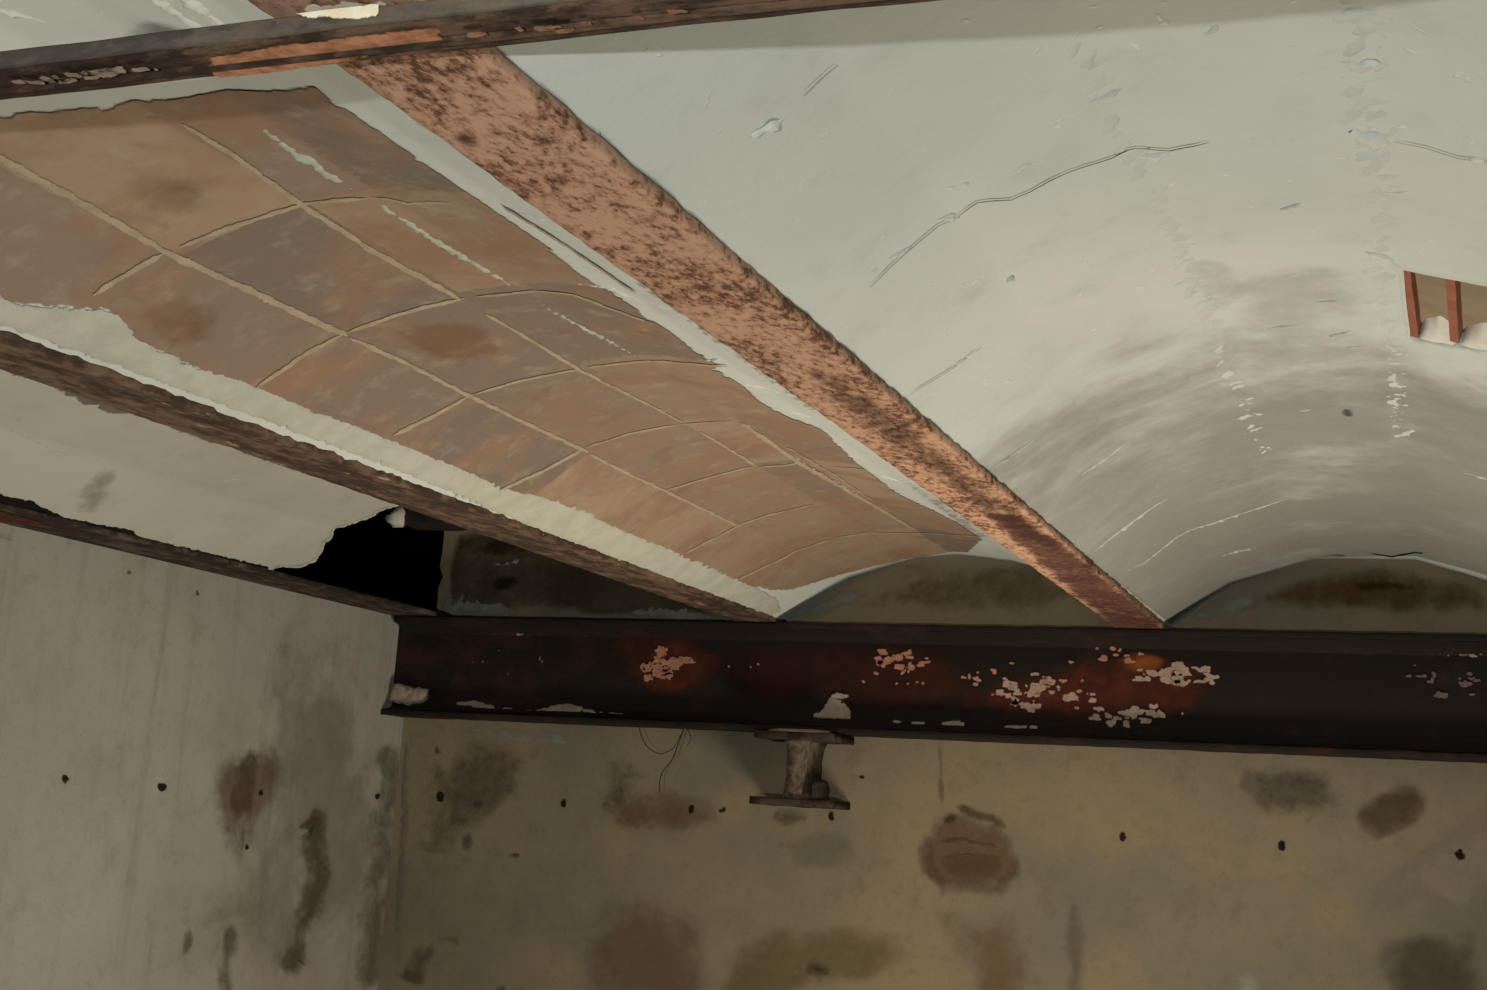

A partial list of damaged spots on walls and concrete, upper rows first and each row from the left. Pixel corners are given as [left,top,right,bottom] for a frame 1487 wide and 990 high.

peeling [11,66,158,85]
rust [210,28,443,78]
peeling [0,88,981,590]
rust [817,374,1162,629]
spalling [182,505,704,615]
rust [621,638,716,692]
rust [734,646,1201,717]
damp [1361,792,1420,834]
damp [283,810,329,970]